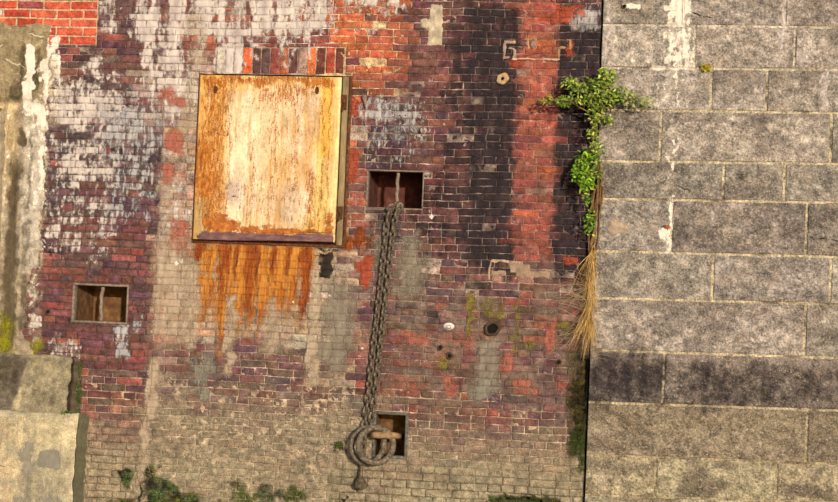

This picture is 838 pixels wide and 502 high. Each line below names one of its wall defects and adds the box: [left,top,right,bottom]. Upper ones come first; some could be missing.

damp [0,0,405,400]
corrosion [195,75,335,235]
corrosion [195,243,315,354]